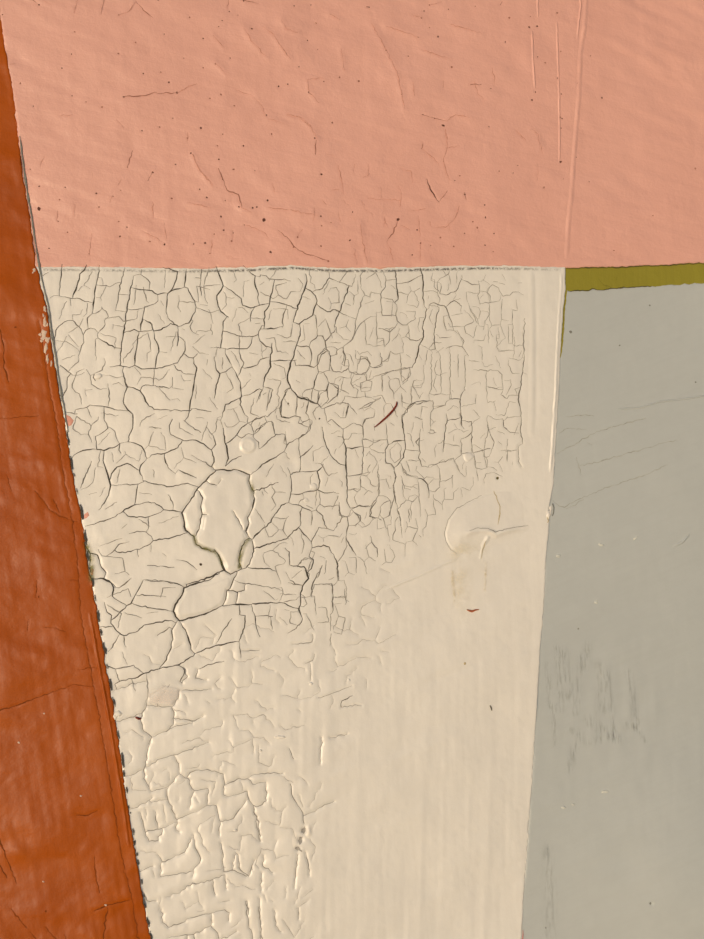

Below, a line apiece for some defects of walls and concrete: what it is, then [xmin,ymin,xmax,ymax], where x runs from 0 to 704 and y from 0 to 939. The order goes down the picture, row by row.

crack [0,2,526,939]